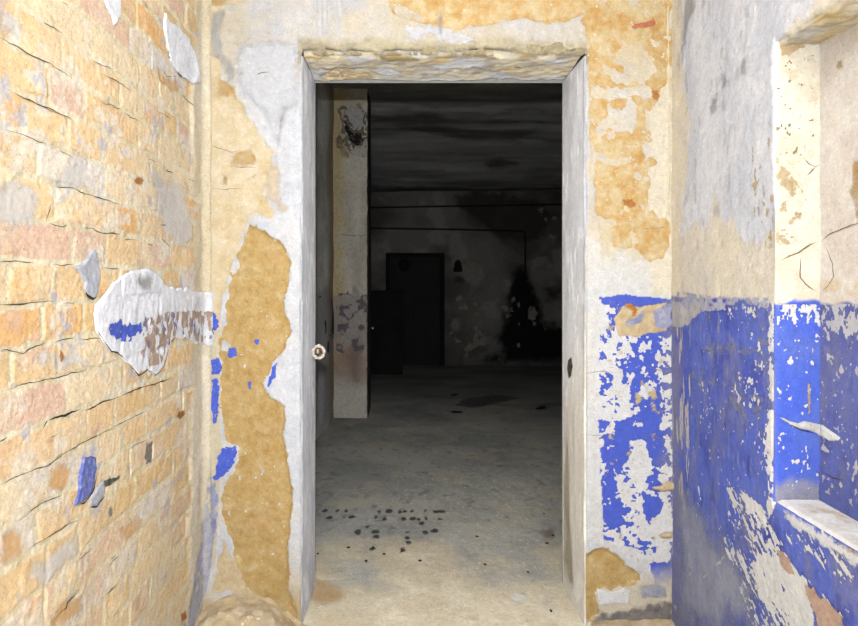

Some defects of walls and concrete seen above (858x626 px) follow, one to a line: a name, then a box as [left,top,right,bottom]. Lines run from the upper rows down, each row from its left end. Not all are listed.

crack [2,38,72,78]
crack [10,90,75,122]
flaking render [157,13,201,94]
spalling [322,68,374,82]
spalling [374,0,696,263]
crack [780,223,858,292]
crack [1,338,98,354]
crack [11,366,100,389]
spalling [74,55,297,626]
flaking render [49,456,120,518]
crack [3,378,172,484]
peeling [585,292,858,626]